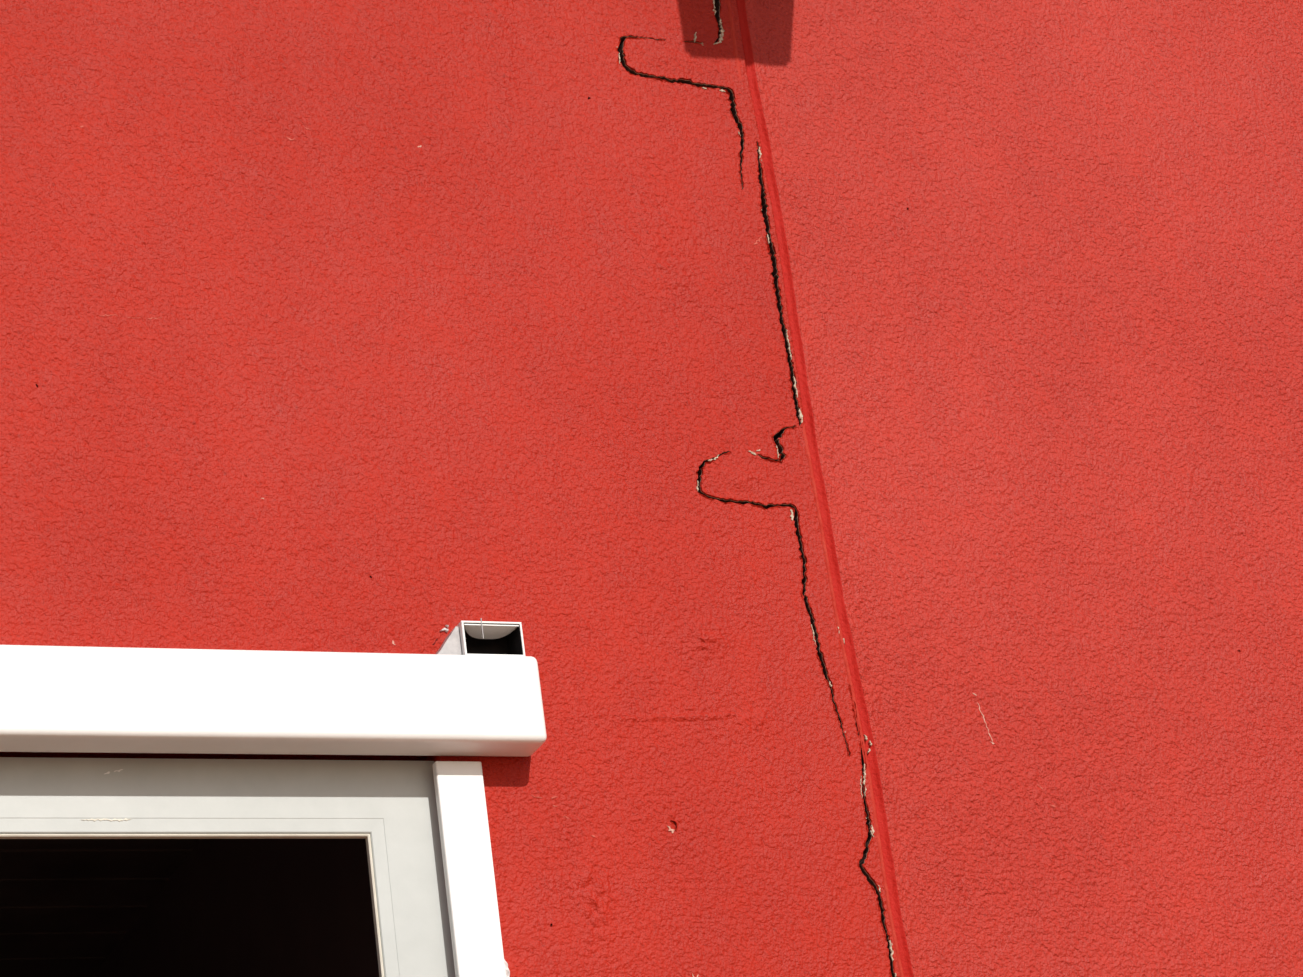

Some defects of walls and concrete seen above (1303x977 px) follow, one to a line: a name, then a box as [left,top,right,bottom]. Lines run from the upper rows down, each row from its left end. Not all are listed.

crack [616,0,897,977]